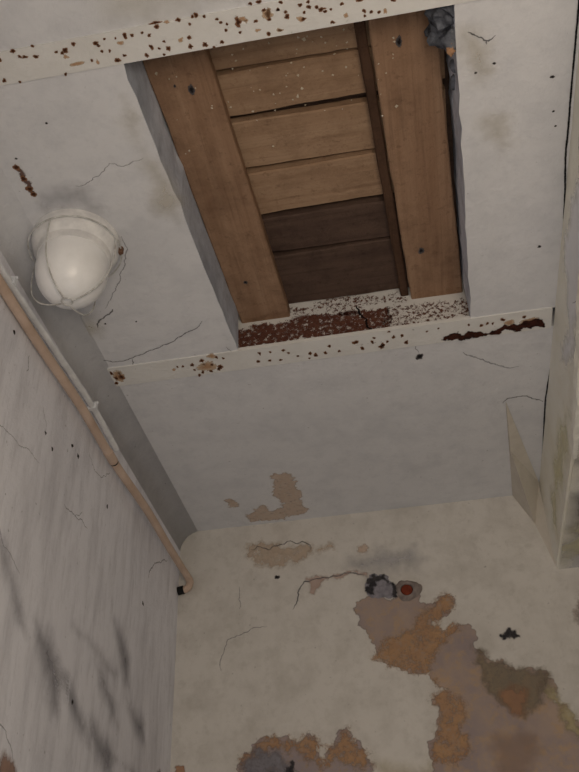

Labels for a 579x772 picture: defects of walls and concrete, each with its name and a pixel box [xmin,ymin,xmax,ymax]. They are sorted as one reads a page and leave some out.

rust [54,0,348,76]
rust [12,164,37,197]
crack [104,323,201,363]
rust [238,292,545,363]
rust [110,370,125,384]
rust [172,353,225,377]
peeling [246,473,308,522]
peeling [248,540,332,579]
peeling [353,574,579,772]
peeling [0,754,15,772]
peeling [236,728,374,772]